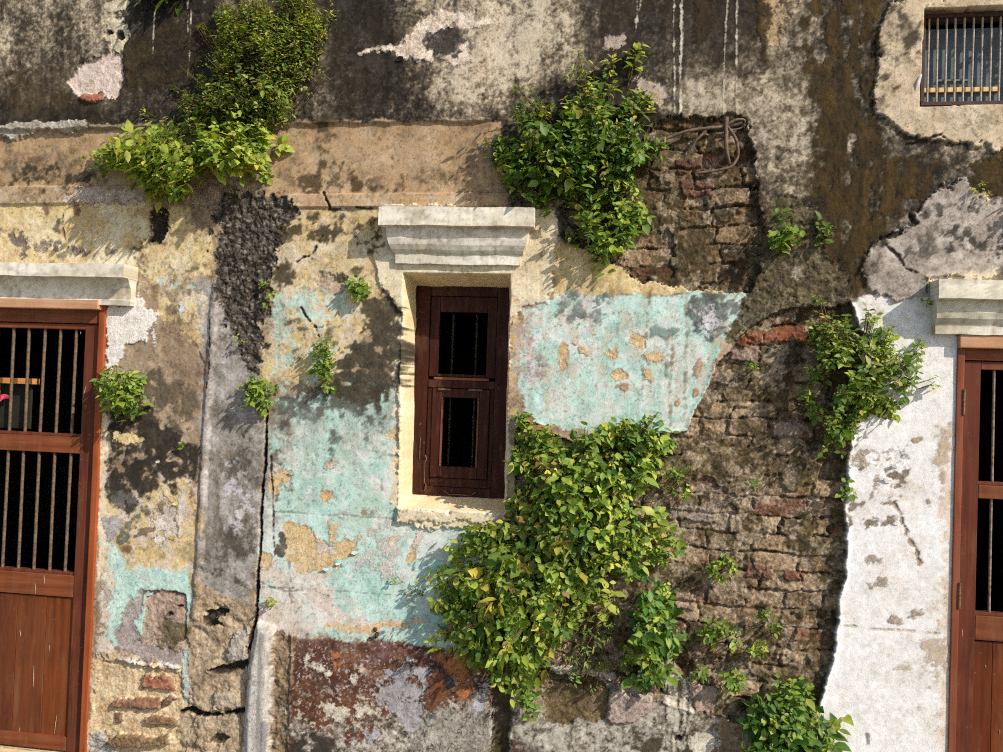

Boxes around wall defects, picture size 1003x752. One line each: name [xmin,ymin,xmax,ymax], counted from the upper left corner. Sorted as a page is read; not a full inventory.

flaking render [67,0,131,103]
damp [122,0,218,92]
flaking render [358,7,495,66]
damp [673,0,738,116]
damp [757,0,773,66]
damp [795,0,1003,308]
damp [272,258,296,292]
damp [273,212,385,254]
peeling [105,295,160,370]
flaking render [515,74,910,725]
peeling [258,510,424,579]
flaking render [91,589,253,752]